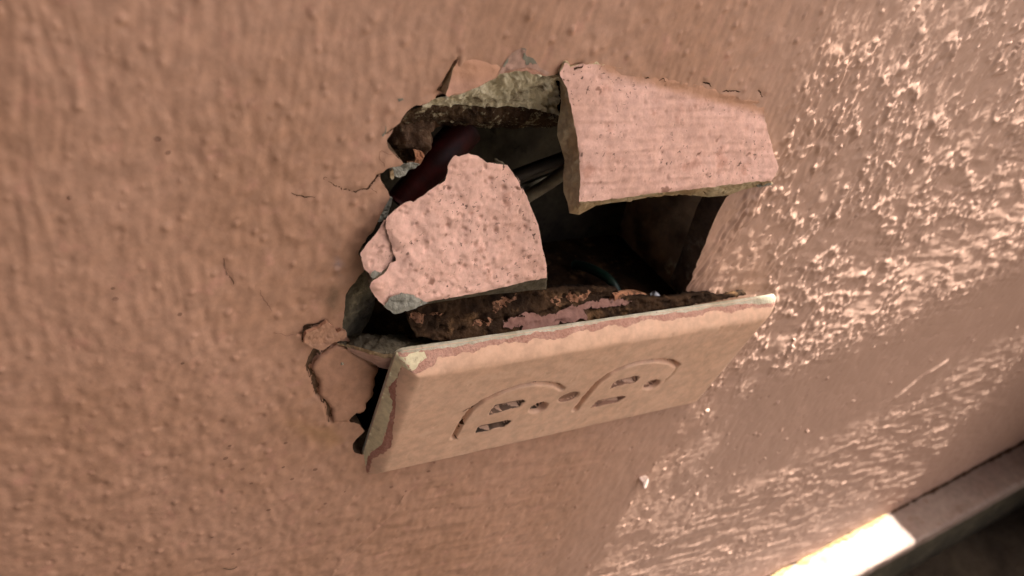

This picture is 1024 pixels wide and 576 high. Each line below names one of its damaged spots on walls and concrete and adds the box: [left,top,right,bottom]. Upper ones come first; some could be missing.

spalling [422,48,561,116]
crack [292,128,396,198]
peeling [407,149,425,166]
spalling [378,197,393,222]
spalling [342,270,375,337]
corrosion [409,312,443,324]
corrosion [473,294,517,326]
peeling [503,298,632,330]
corrosion [550,290,590,306]